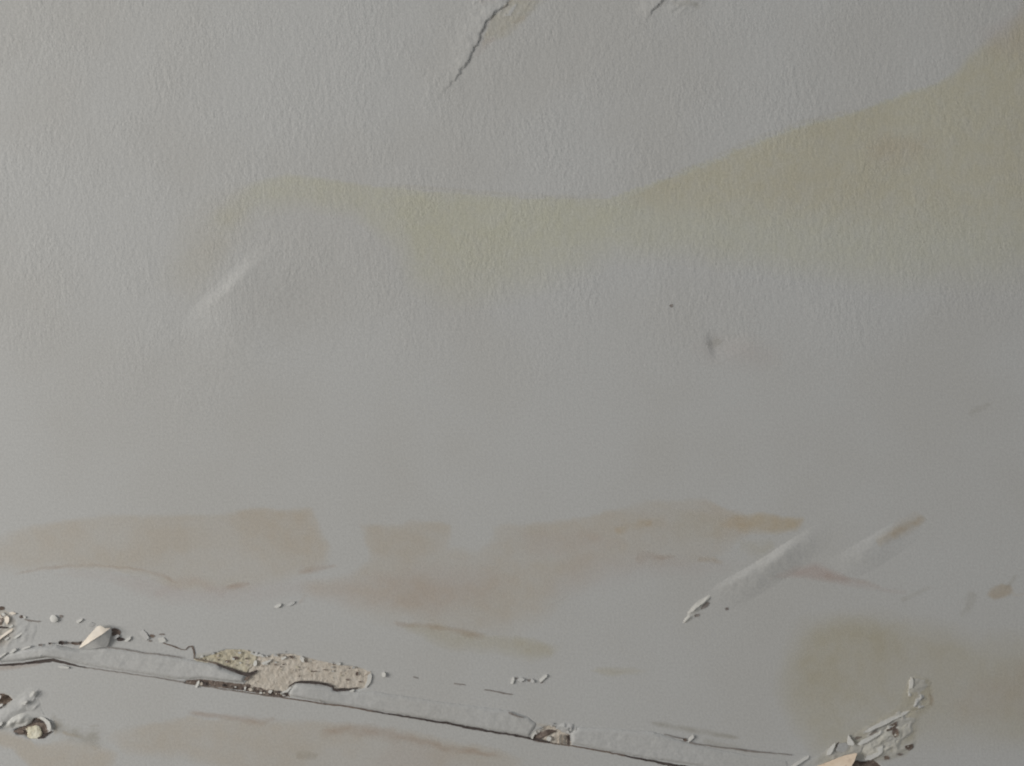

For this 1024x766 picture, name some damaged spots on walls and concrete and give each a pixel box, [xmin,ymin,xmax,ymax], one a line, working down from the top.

peeling [0,606,131,658]
flaking render [185,649,386,697]
peeling [0,691,35,708]